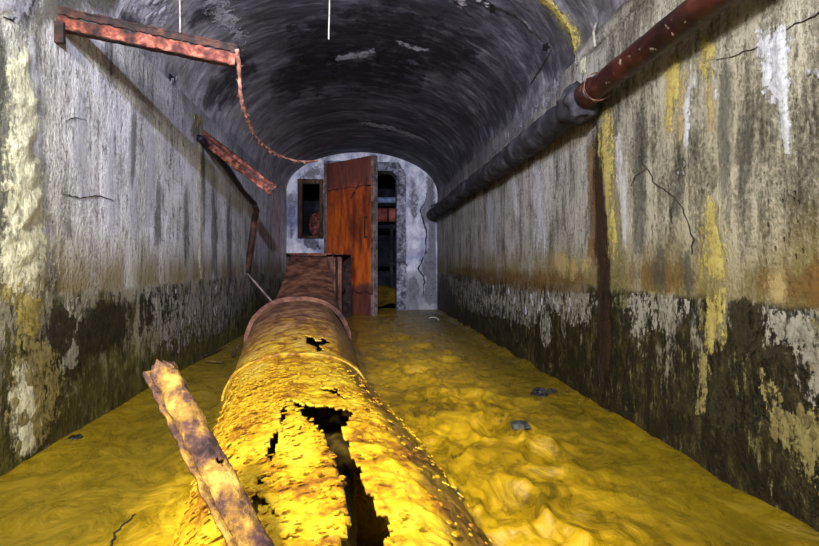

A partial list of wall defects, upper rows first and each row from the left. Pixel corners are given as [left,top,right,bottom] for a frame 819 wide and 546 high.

crack [786,12,819,30]
damp [755,26,791,154]
crack [65,194,115,202]
rust [452,122,611,400]
crack [631,156,695,254]
damp [688,196,805,437]
peeling [758,307,819,495]